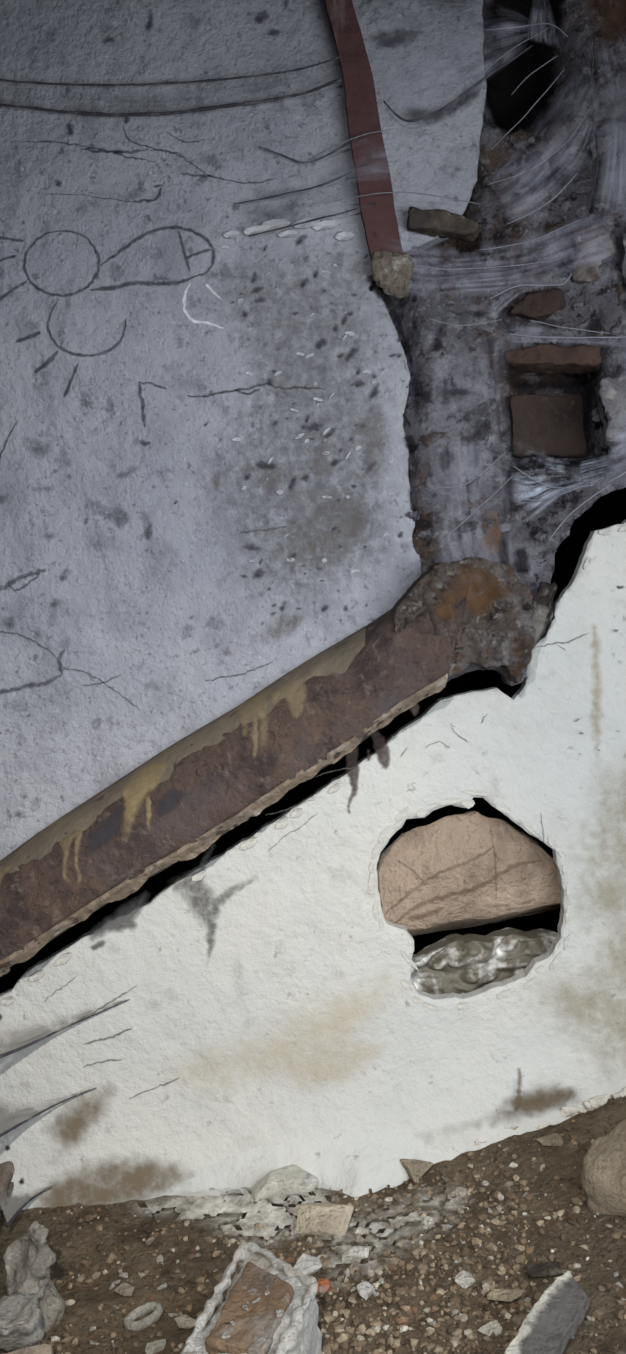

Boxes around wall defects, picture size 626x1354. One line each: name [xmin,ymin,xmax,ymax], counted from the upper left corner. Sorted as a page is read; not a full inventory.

flaking render [221,217,356,251]
flaking render [296,264,378,398]
flaking render [270,382,365,466]
flaking render [242,457,308,494]
crack [6,570,46,591]
crack [1,631,135,706]
rust [123,764,165,826]
rust [346,732,389,812]
flaking render [368,790,574,999]
damp [505,1072,626,1131]